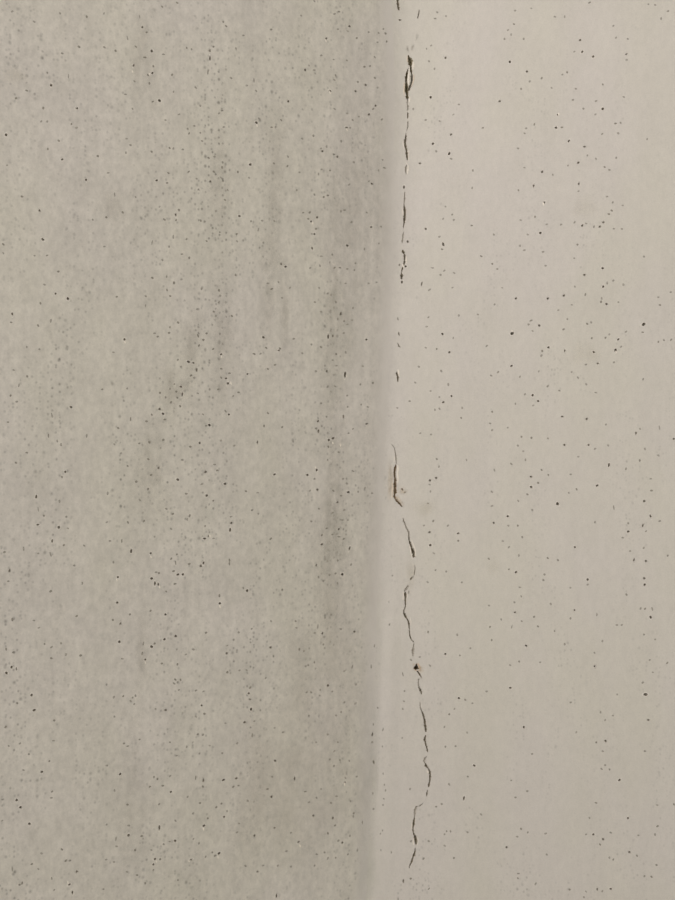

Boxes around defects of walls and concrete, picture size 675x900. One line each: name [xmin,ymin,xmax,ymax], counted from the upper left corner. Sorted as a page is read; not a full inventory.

crack [400,100,409,279]
crack [392,445,431,868]